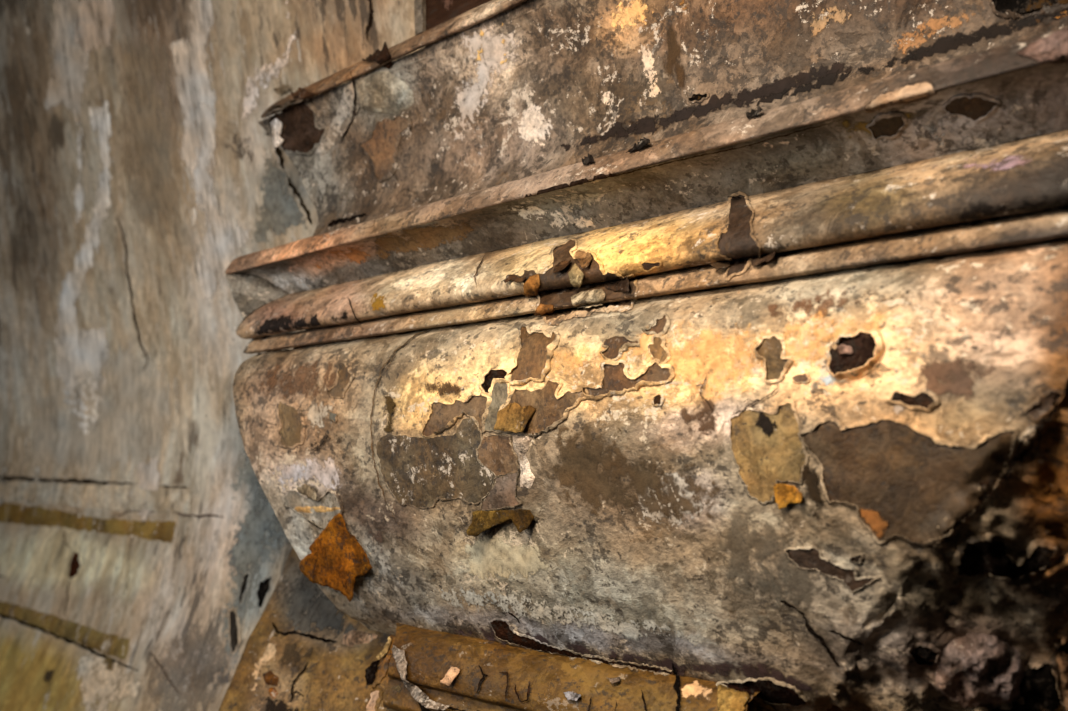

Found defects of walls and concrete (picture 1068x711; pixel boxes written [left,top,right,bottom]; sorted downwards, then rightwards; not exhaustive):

crack [365,0,374,41]
crack [340,72,361,143]
leakage [0,0,307,491]
peeling [710,191,776,281]
crack [116,216,148,372]
peeling [375,237,676,537]
peeling [753,332,811,385]
spalling [825,327,885,381]
leakage [755,412,777,437]
leakage [800,466,824,519]
peeling [727,387,1067,582]
crack [588,663,681,711]